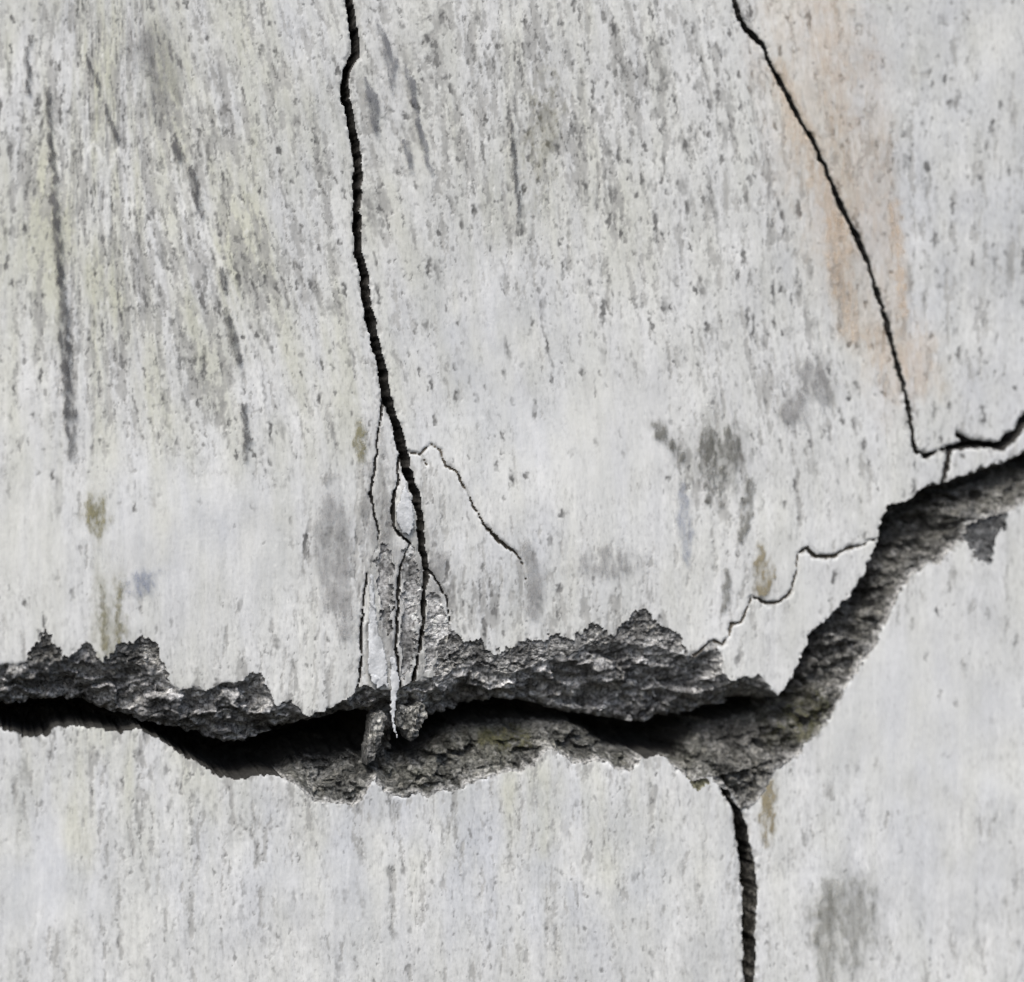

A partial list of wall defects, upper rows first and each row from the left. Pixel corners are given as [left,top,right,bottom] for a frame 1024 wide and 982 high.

crack [340,0,451,682]
crack [430,443,466,489]
crack [0,450,1024,810]
crack [732,0,1024,484]
crack [720,787,758,982]